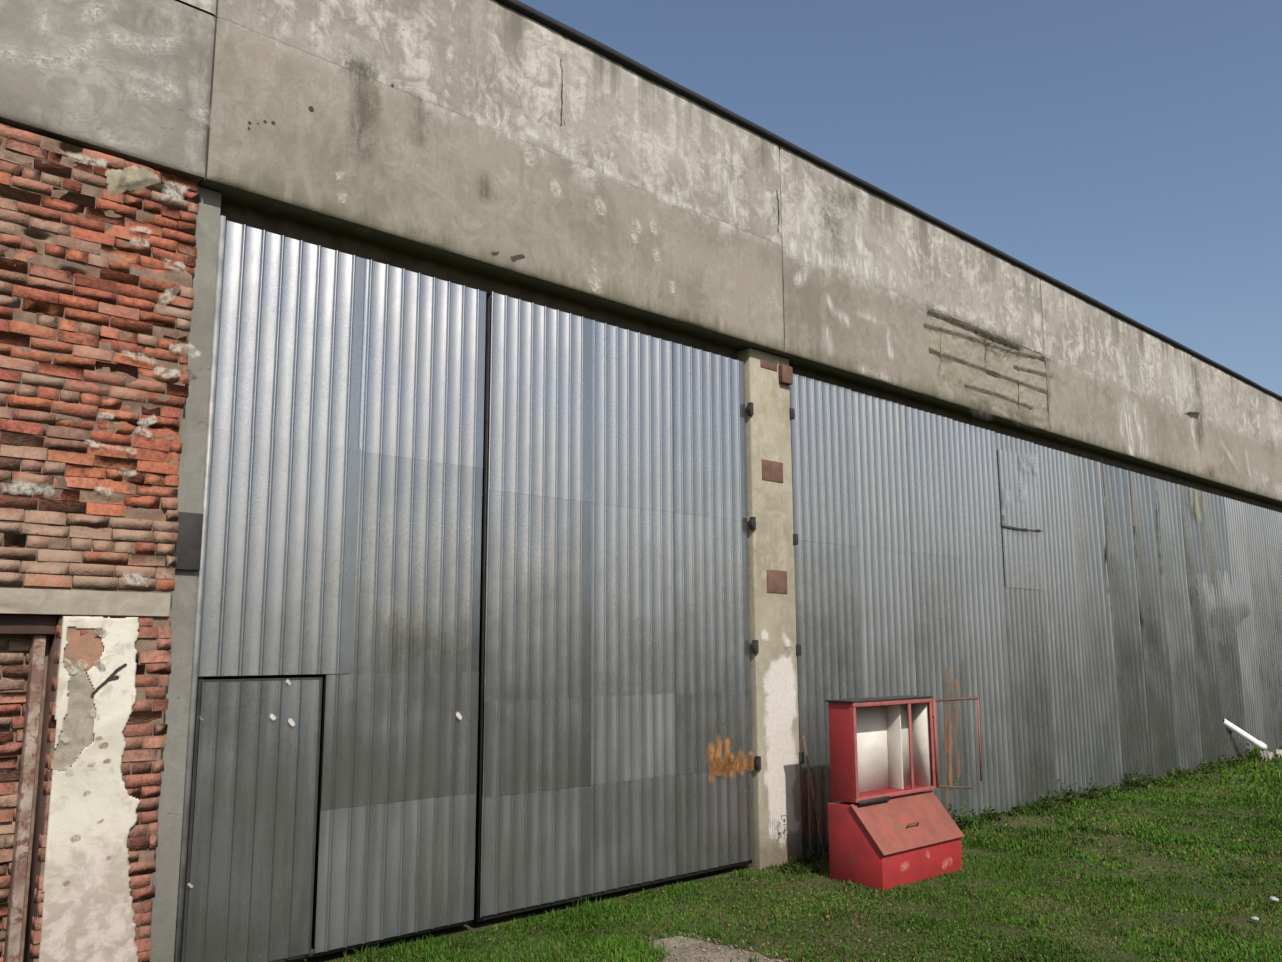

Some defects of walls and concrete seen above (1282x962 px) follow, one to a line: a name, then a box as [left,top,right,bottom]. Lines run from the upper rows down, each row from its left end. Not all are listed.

crack [558,58,566,126]
spalling [924,310,1052,429]
flaking render [51,627,110,775]
corrosion [709,741,753,776]